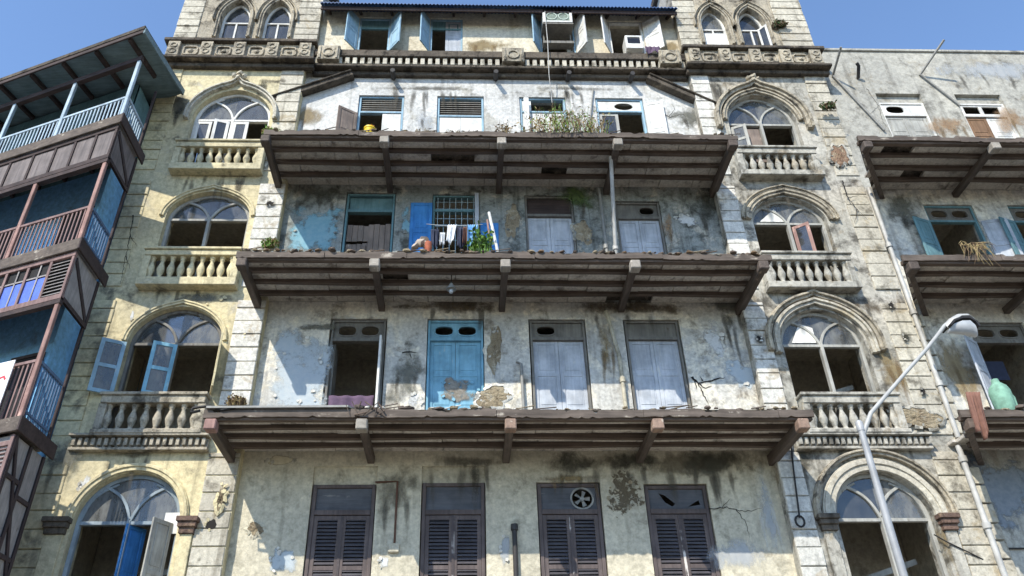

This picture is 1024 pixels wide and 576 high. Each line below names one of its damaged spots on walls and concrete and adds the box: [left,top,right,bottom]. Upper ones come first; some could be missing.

flaking render [827,144,852,168]
damp [386,343,422,401]
flaking render [441,324,514,409]
crack [691,377,724,402]
damp [553,453,596,487]
damp [607,451,741,491]
peeling [607,470,645,518]
crack [709,500,760,538]